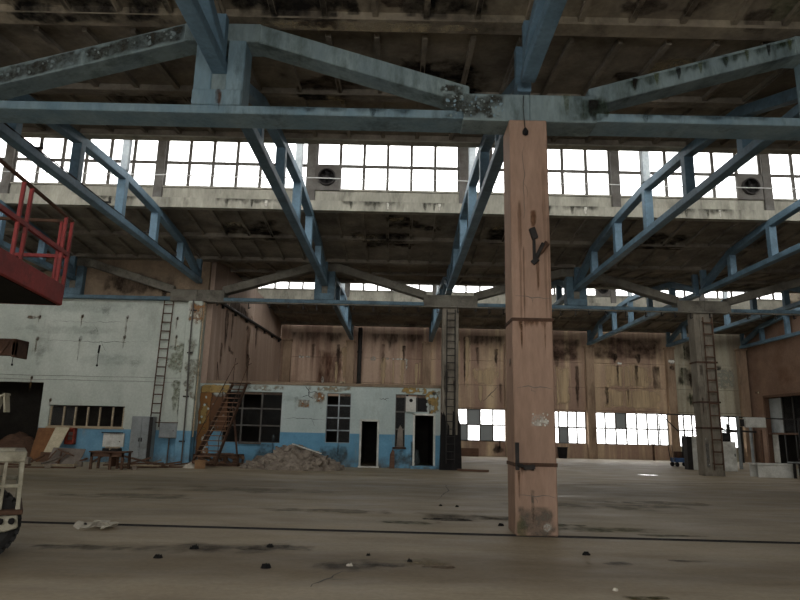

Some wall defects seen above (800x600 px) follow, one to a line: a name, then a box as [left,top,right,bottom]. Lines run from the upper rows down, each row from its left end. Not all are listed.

damp [614,59,706,89]
peeling [440,84,504,118]
damp [352,202,435,249]
damp [487,226,505,244]
damp [312,333,347,383]
flaking render [299,377,325,407]